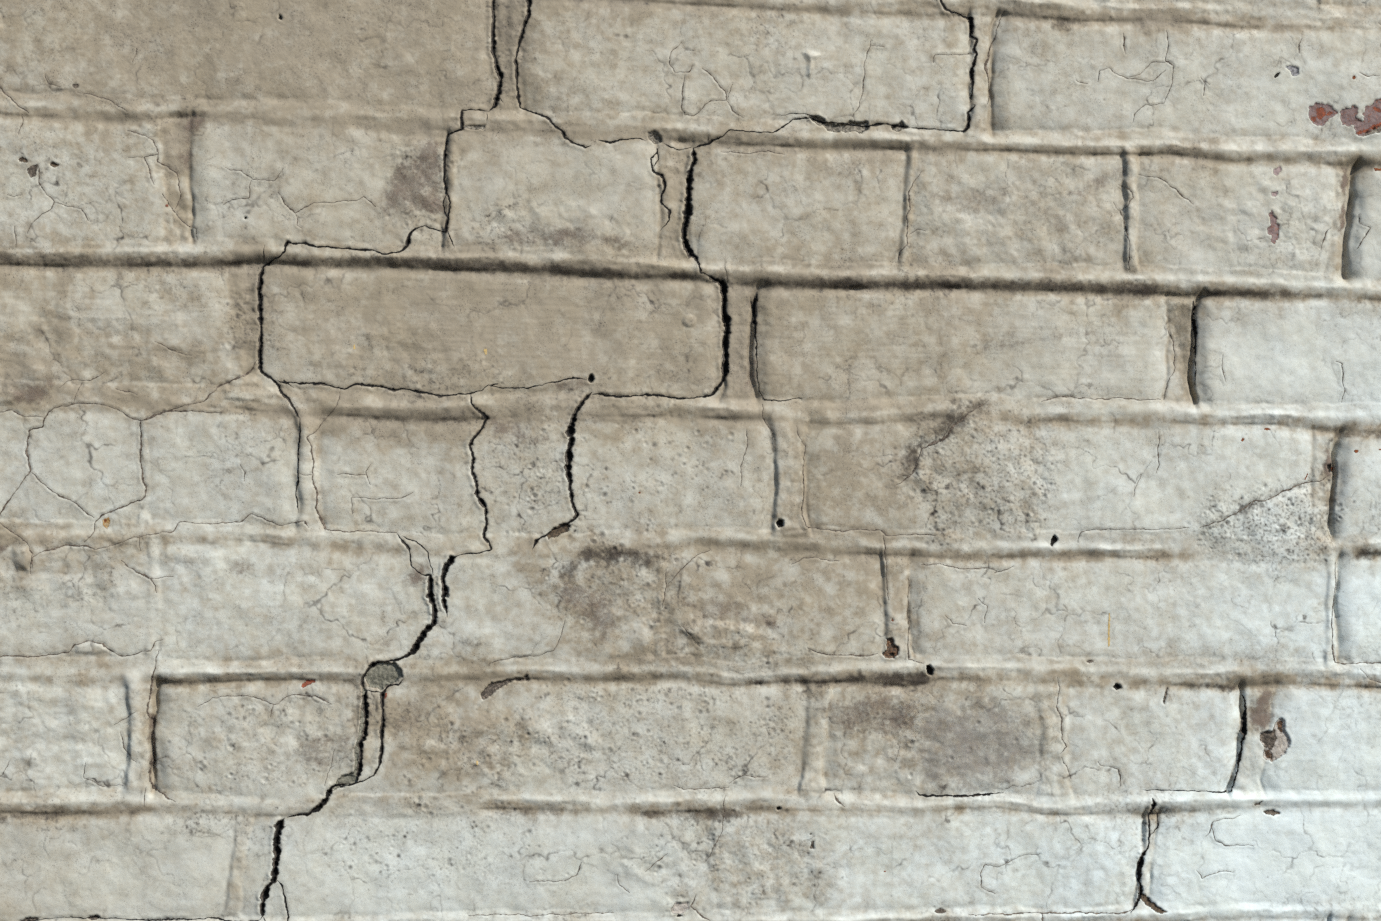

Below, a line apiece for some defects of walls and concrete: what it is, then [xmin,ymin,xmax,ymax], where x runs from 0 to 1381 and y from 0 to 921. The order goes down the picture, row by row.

peeling [1309,99,1381,136]
crack [0,0,1013,921]
crack [969,680,1253,921]
spalling [1260,718,1291,762]